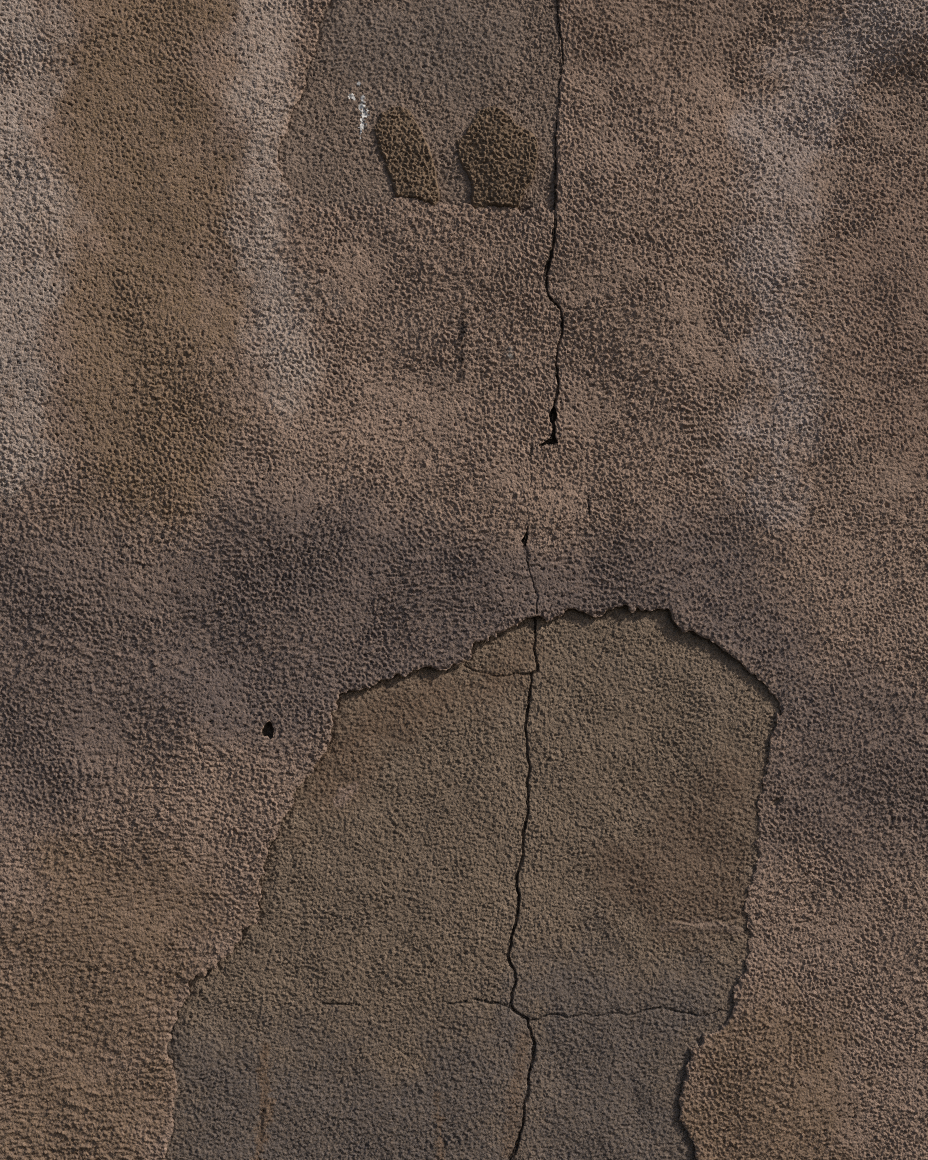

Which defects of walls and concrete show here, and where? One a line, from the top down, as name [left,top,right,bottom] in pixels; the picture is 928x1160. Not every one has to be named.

flaking render [278,0,562,214]
crack [530,6,564,484]
flaking render [163,605,782,1160]
crack [445,529,726,1160]